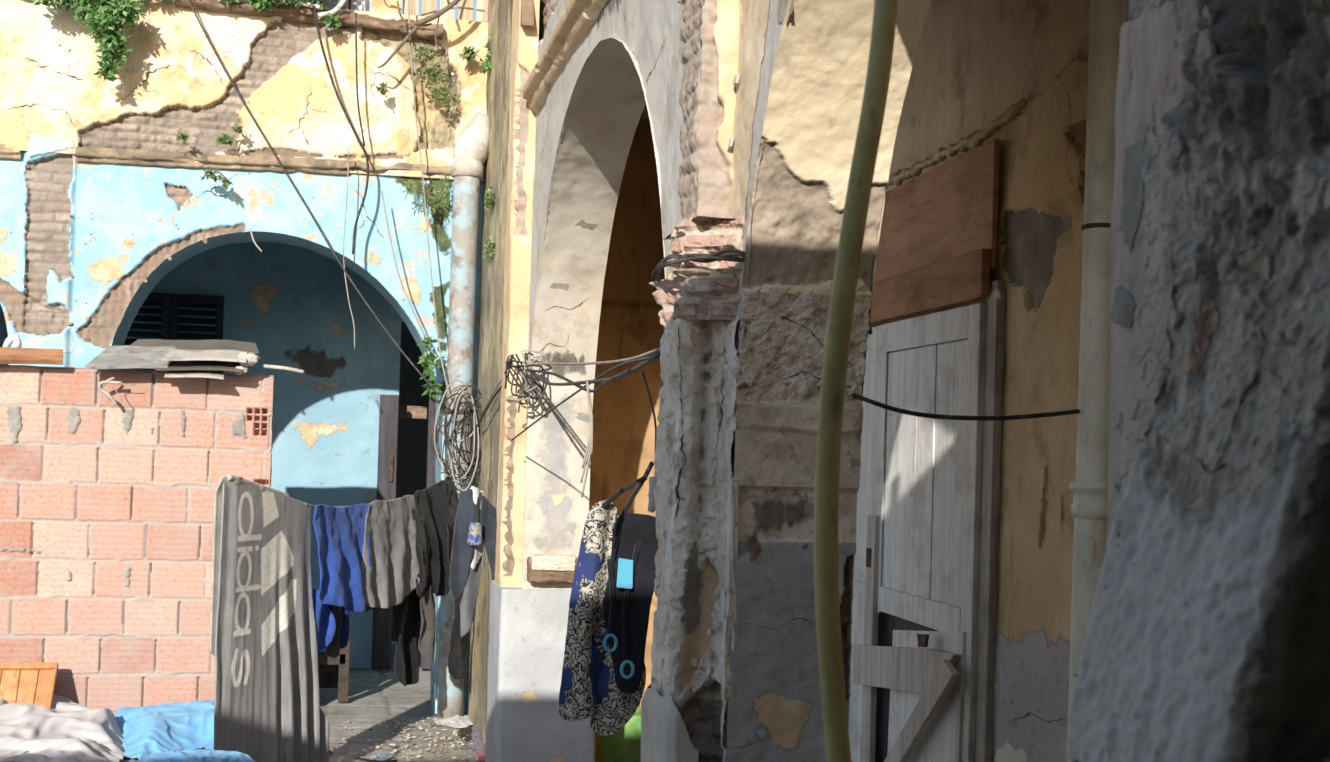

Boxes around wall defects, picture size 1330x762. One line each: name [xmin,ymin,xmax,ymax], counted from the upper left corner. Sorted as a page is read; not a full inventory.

flaking render [0,16,462,353]
peeling [678,0,844,289]
peeling [858,0,1090,292]
peeling [999,207,1072,312]
peeling [293,416,348,449]
peeling [752,692,813,750]
peeling [993,741,1028,762]